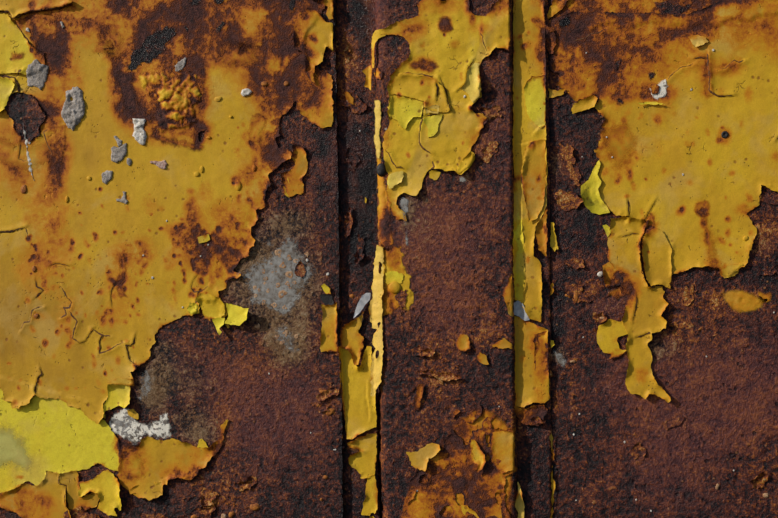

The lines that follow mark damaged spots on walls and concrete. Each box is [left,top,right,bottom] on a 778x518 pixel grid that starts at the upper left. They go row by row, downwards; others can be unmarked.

rust [0,92,66,186]
rust [94,26,203,150]
crack [403,72,463,169]
rust [555,143,583,211]
crack [0,227,28,239]
crack [21,283,135,364]
peeling [0,0,334,518]
rust [395,290,408,309]
peeling [320,0,778,518]
rust [695,201,717,268]
rust [724,291,771,312]
rust [189,487,235,518]